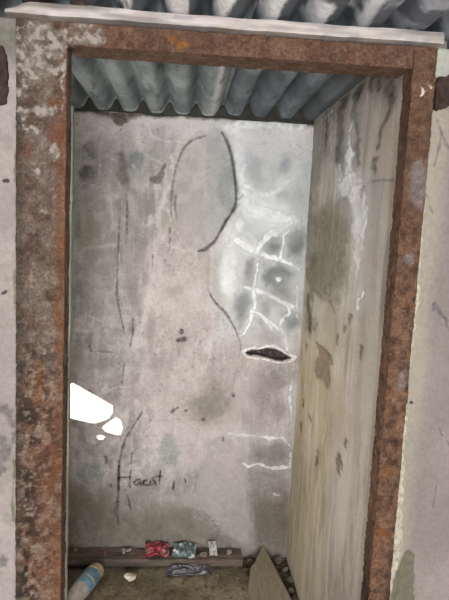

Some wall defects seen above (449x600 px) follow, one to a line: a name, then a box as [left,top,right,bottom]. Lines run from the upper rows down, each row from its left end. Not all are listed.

crack [169,136,203,243]
crack [198,132,242,252]
damp [307,77,395,332]
spalling [241,344,298,364]